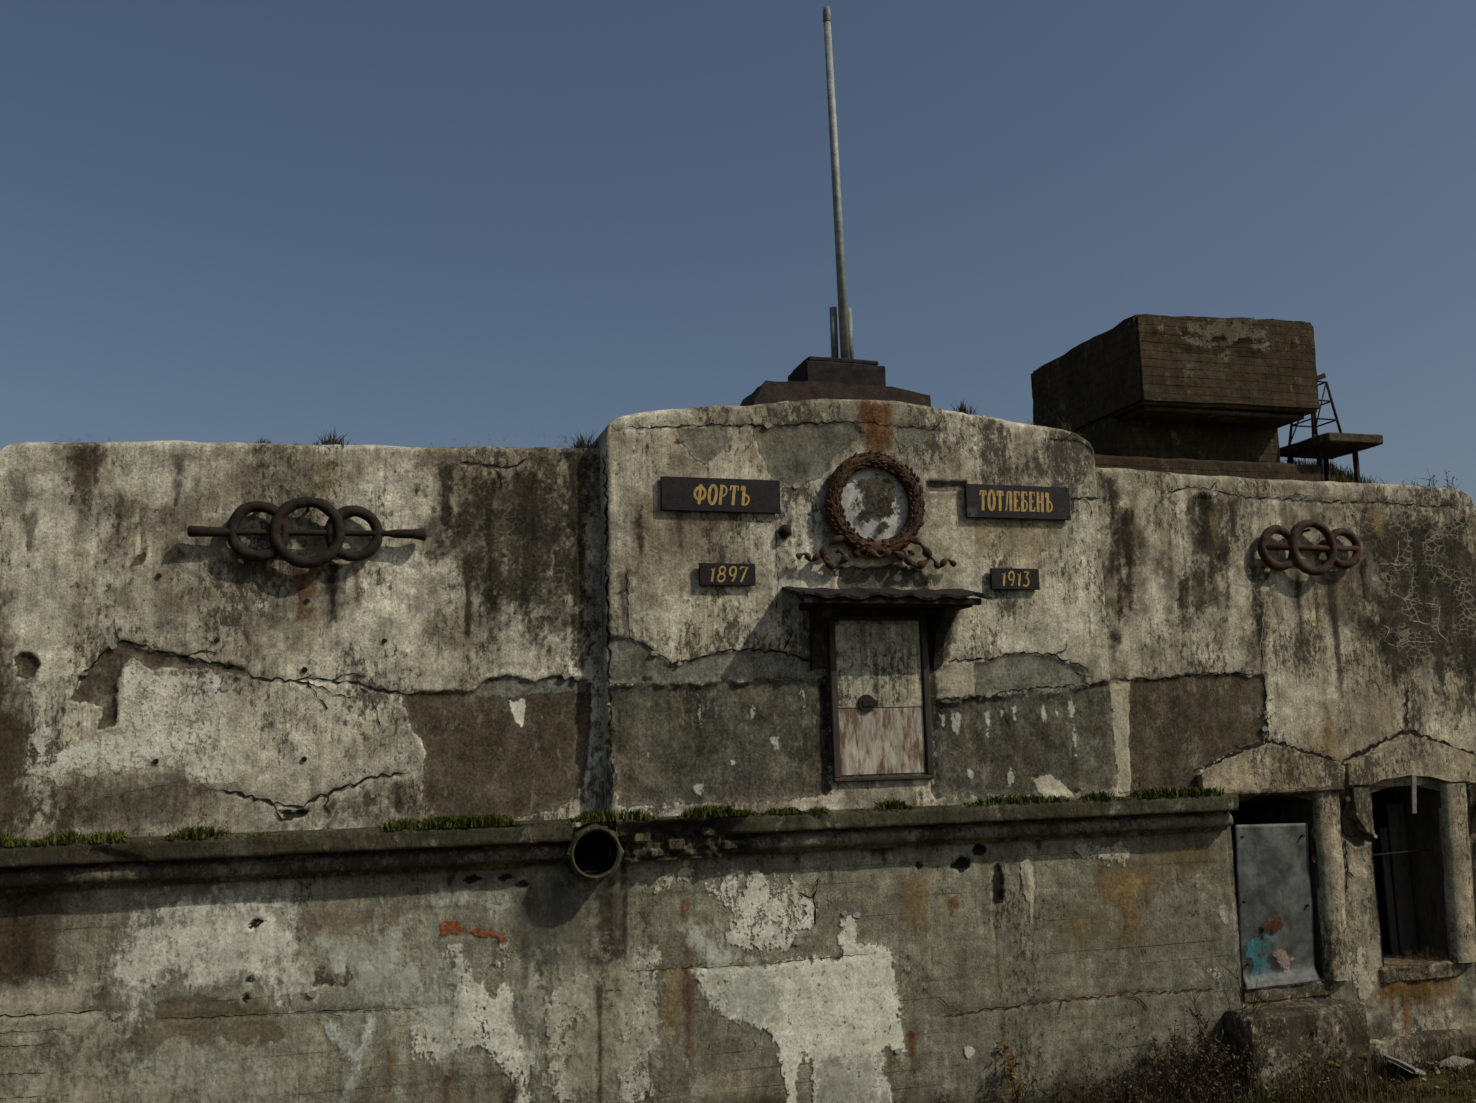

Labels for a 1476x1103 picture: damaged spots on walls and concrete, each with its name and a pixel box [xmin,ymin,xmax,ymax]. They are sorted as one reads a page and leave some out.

corrosion [858,400,892,452]
water stain [415,437,629,666]
water stain [635,506,644,553]
crack [1154,479,1468,535]
water stain [1296,491,1476,707]
crack [77,617,417,727]
spalling [402,635,832,820]
crack [935,581,1475,893]
crack [211,772,407,820]
spalling [950,843,1005,904]
peeling [0,859,907,1103]
crack [934,988,1227,1017]